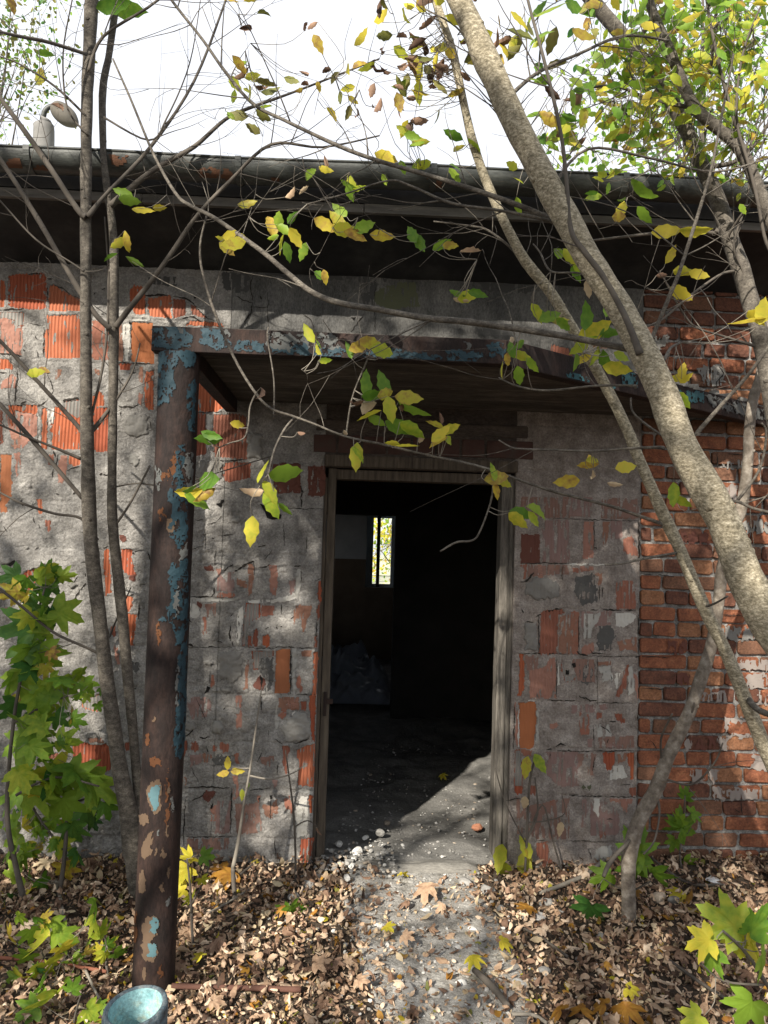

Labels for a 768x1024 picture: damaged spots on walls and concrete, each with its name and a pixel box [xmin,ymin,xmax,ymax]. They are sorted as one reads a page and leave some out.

spalling [0,273,80,359]
spalling [0,359,13,370]
peeling [360,342,506,362]
spalling [92,391,108,452]
spalling [0,399,80,513]
spalling [36,499,51,532]
spalling [119,284,345,759]
spalling [538,609,576,683]
spalling [616,664,629,697]
peeling [138,779,174,907]
peeling [140,915,160,981]